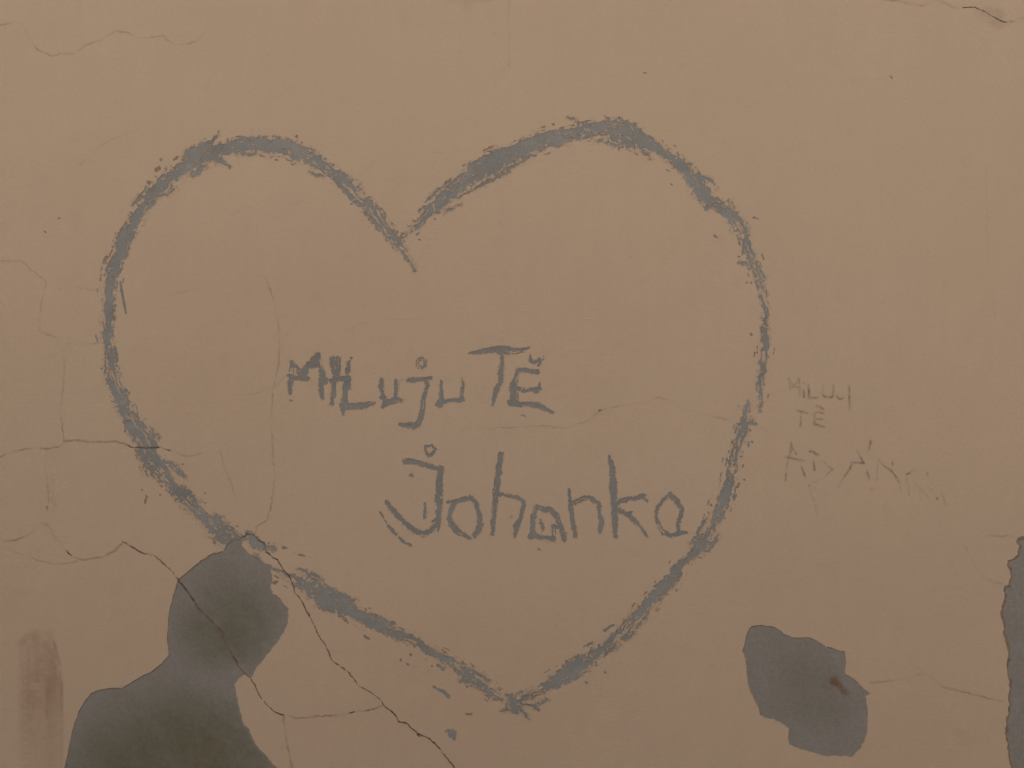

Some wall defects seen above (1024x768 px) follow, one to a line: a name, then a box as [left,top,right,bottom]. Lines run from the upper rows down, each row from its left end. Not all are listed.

crack [128,444,170,452]
peeling [64,539,289,768]
crack [124,542,284,716]
crack [240,533,455,768]
peeling [742,625,870,758]
peeling [1000,536,1024,768]